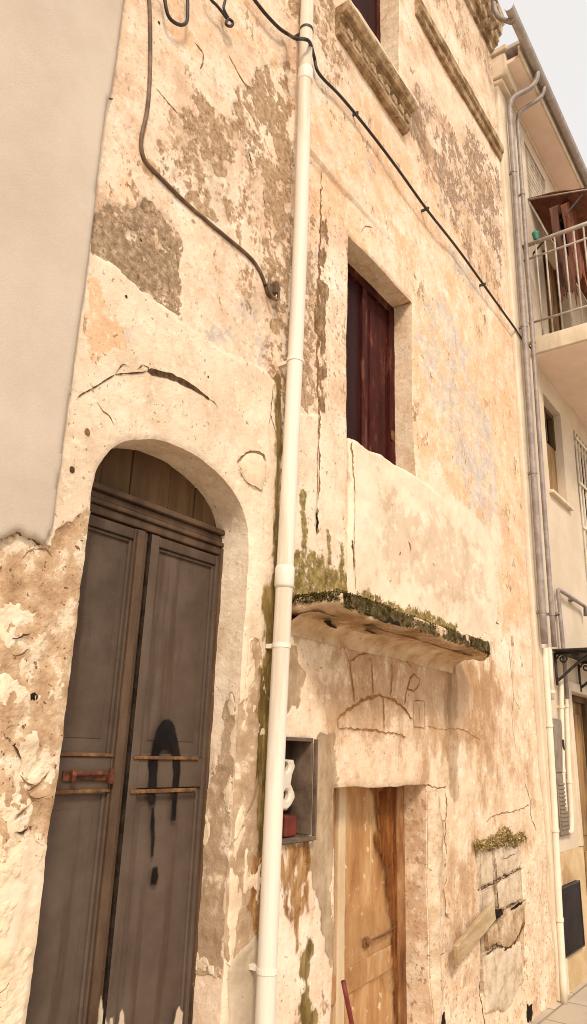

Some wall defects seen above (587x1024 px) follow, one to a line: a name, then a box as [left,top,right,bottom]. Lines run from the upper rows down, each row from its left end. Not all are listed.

spalling [91,197,183,315]
spalling [159,60,298,452]
spalling [412,82,502,266]
crack [78,364,217,424]
crack [315,172,323,534]
peeling [0,510,91,1024]
peeling [195,637,270,978]
leakage [255,373,282,858]
leakage [292,489,490,653]
crack [338,648,485,740]
leakage [298,938,318,1024]